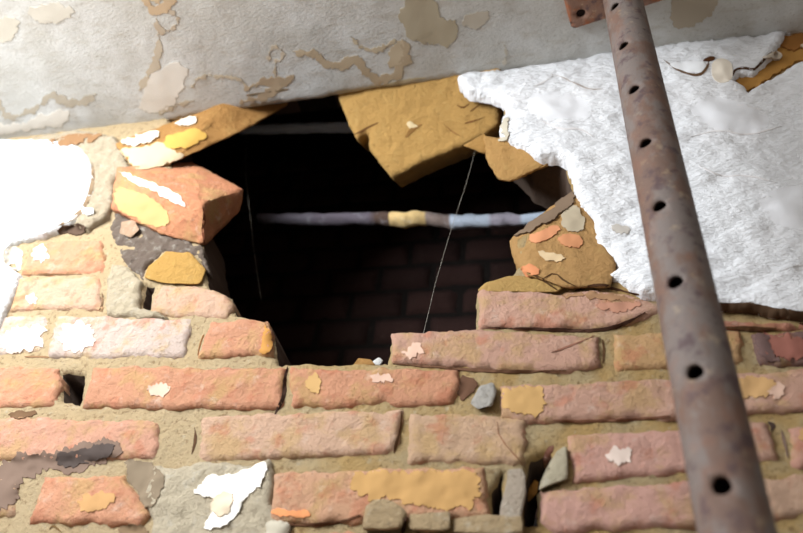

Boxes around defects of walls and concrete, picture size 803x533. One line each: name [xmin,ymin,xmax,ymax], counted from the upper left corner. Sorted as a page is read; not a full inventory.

leakage [138,0,489,115]
crack [664,60,709,76]
crack [733,50,776,75]
leakage [0,91,97,135]
spalling [120,130,186,207]
leakage [163,128,207,150]
flaking render [174,116,197,127]
flaking render [457,52,656,301]
flaking render [655,31,803,315]
flaking render [0,133,102,327]
flaking render [194,462,267,531]
spalling [265,520,290,533]